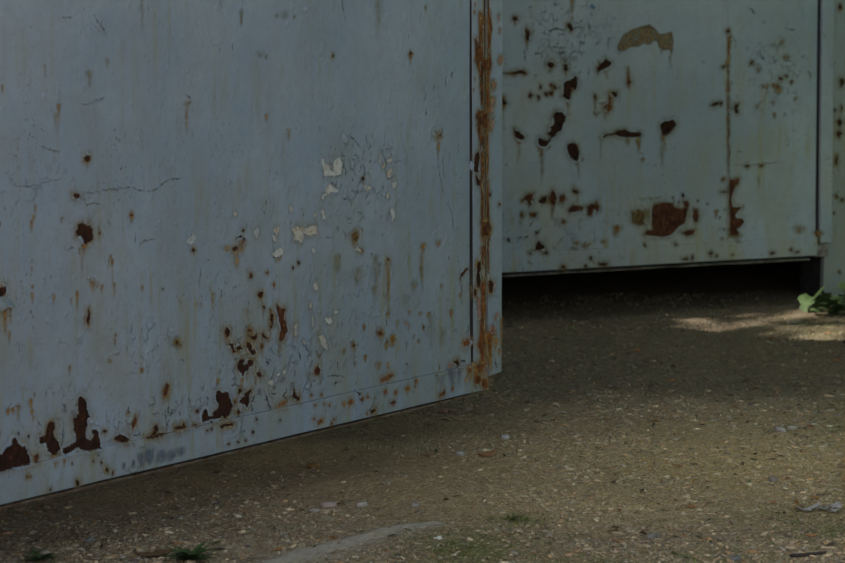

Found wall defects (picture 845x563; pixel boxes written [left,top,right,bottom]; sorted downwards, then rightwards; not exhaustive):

rust [528,59,581,173]
rust [75,221,101,252]
rust [453,0,527,390]
rust [631,177,746,248]
rust [0,282,9,297]
rust [144,290,289,440]
rust [0,394,138,479]